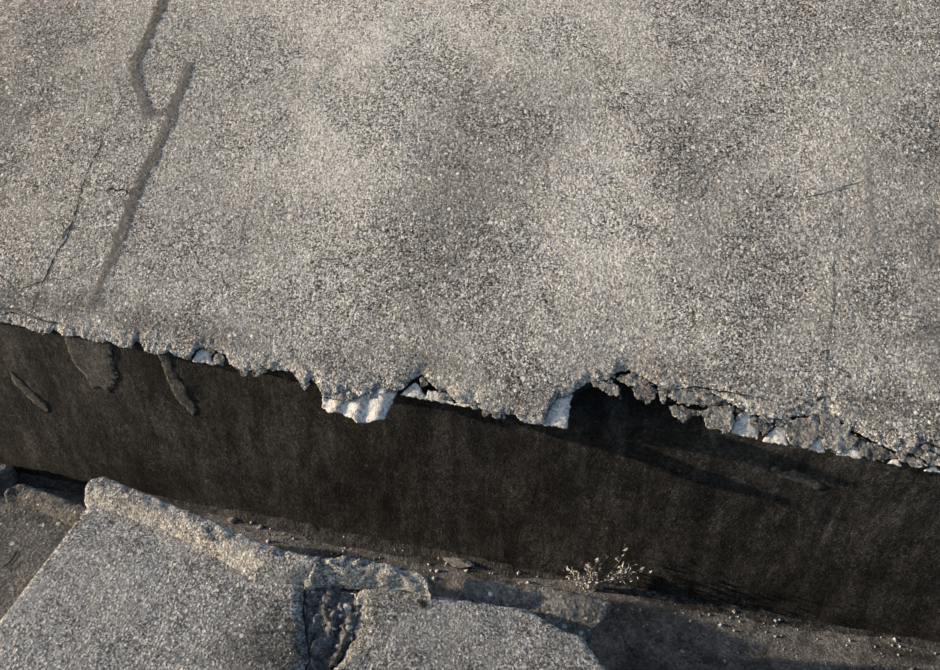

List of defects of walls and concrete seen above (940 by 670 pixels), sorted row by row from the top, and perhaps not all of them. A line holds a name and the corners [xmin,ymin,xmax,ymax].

water stain [100,0,193,277]
crack [0,94,128,329]
peeling [65,336,120,393]
peeling [158,353,198,416]
spalling [193,348,226,367]
spalling [322,377,506,423]
spalling [542,394,573,429]
spalling [592,371,940,474]
peeling [770,466,826,491]